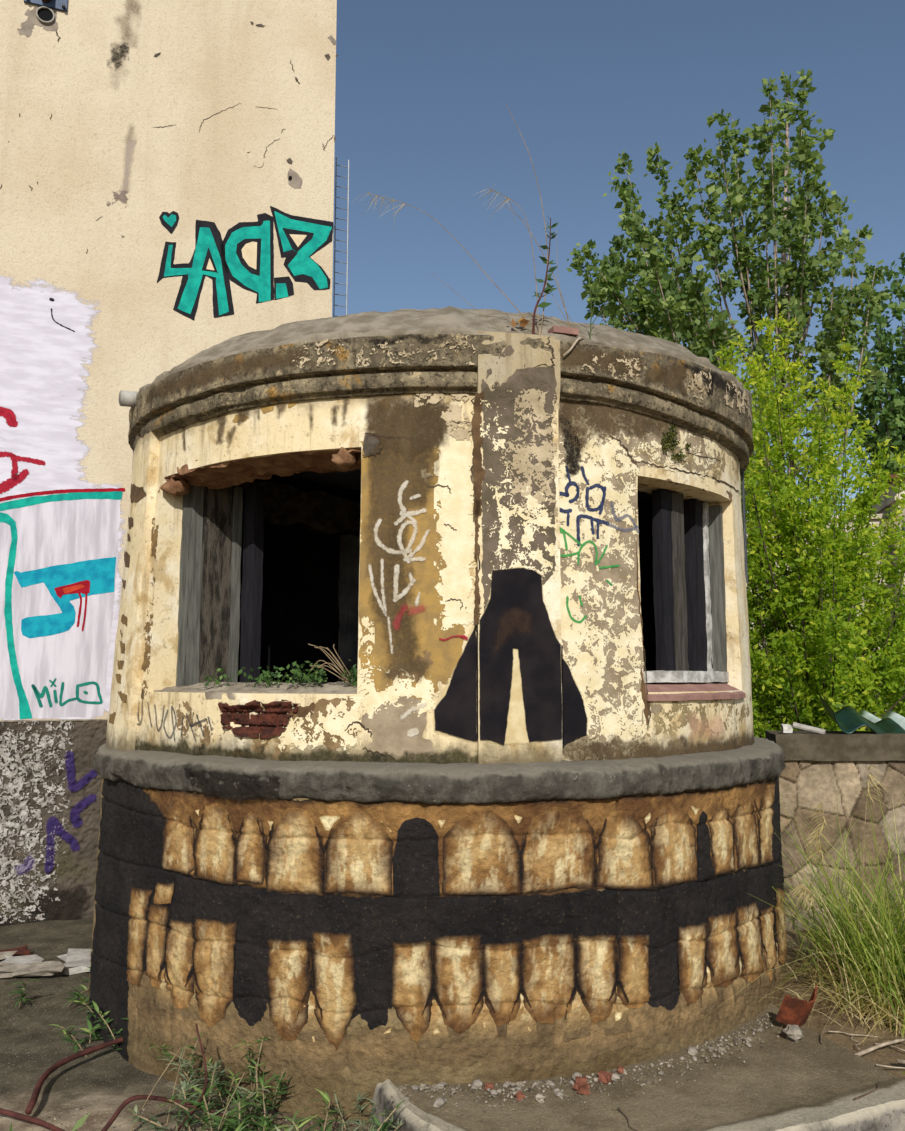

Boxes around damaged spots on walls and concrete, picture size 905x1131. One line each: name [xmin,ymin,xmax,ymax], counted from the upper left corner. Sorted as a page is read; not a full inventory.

water stain [108,31,129,67]
peeling [176,333,752,761]